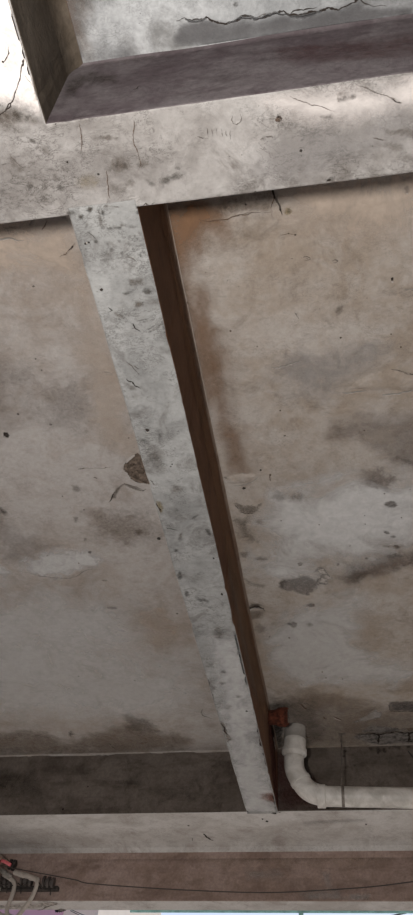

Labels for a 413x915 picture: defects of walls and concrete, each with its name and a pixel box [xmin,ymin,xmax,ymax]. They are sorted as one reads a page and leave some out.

crack [178,0,385,25]
crack [0,51,31,115]
spalling [110,453,154,501]
peeling [21,551,100,579]
leakage [348,545,410,579]
spalling [354,701,413,745]